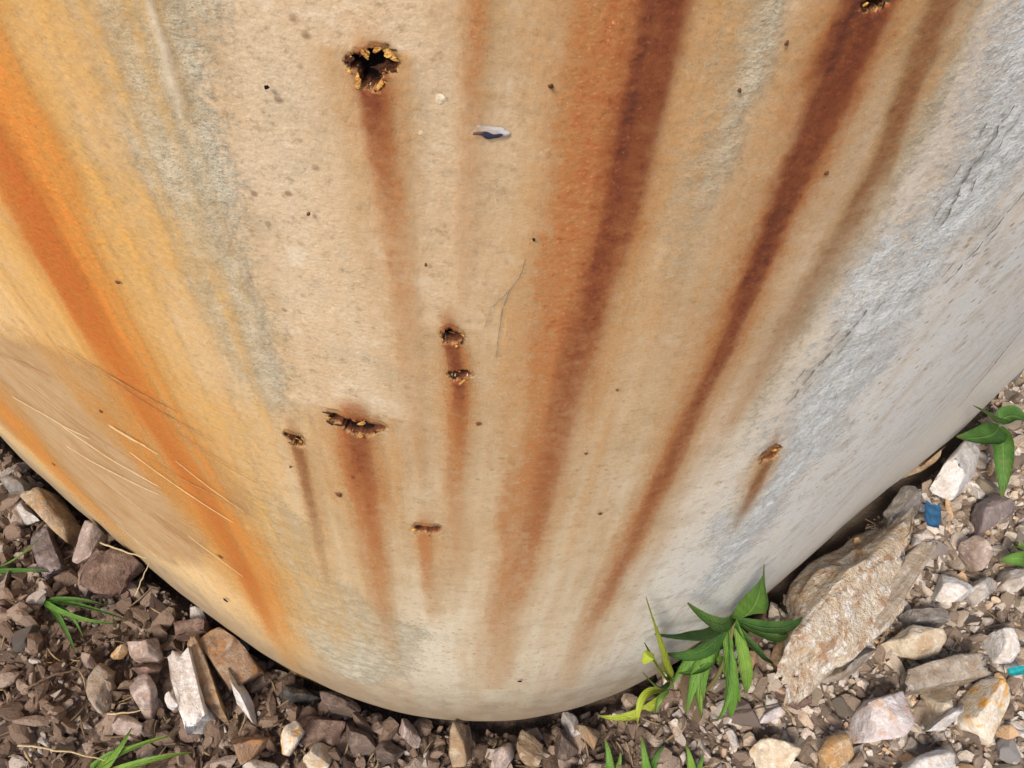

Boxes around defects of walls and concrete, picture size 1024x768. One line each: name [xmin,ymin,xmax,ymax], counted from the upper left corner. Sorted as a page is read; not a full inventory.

corrosion [334,52,413,236]
corrosion [0,0,338,636]
corrosion [428,322,478,486]
corrosion [494,0,742,612]
corrosion [594,0,972,611]
corrosion [318,405,406,603]
corrosion [412,520,444,580]